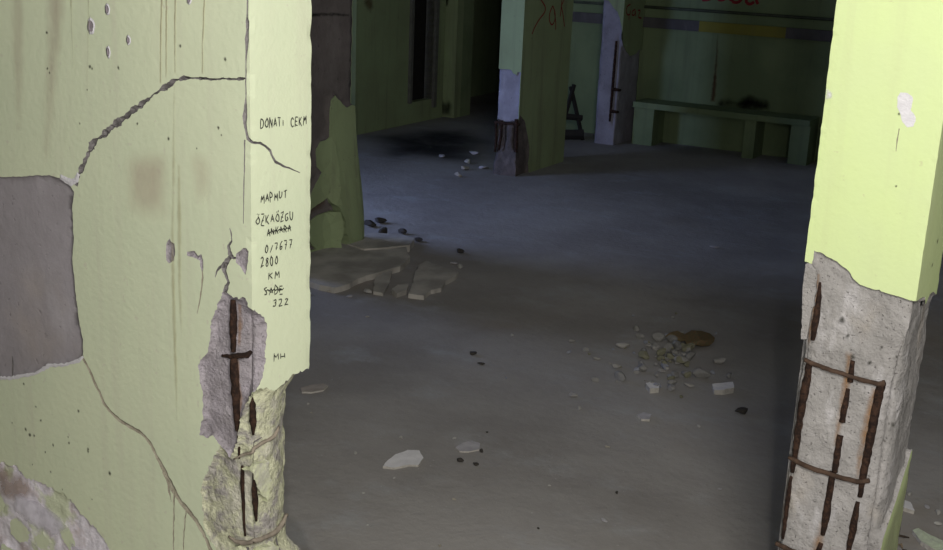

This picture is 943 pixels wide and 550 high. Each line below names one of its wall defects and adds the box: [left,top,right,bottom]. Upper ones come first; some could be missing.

spalling [778,251,936,550]